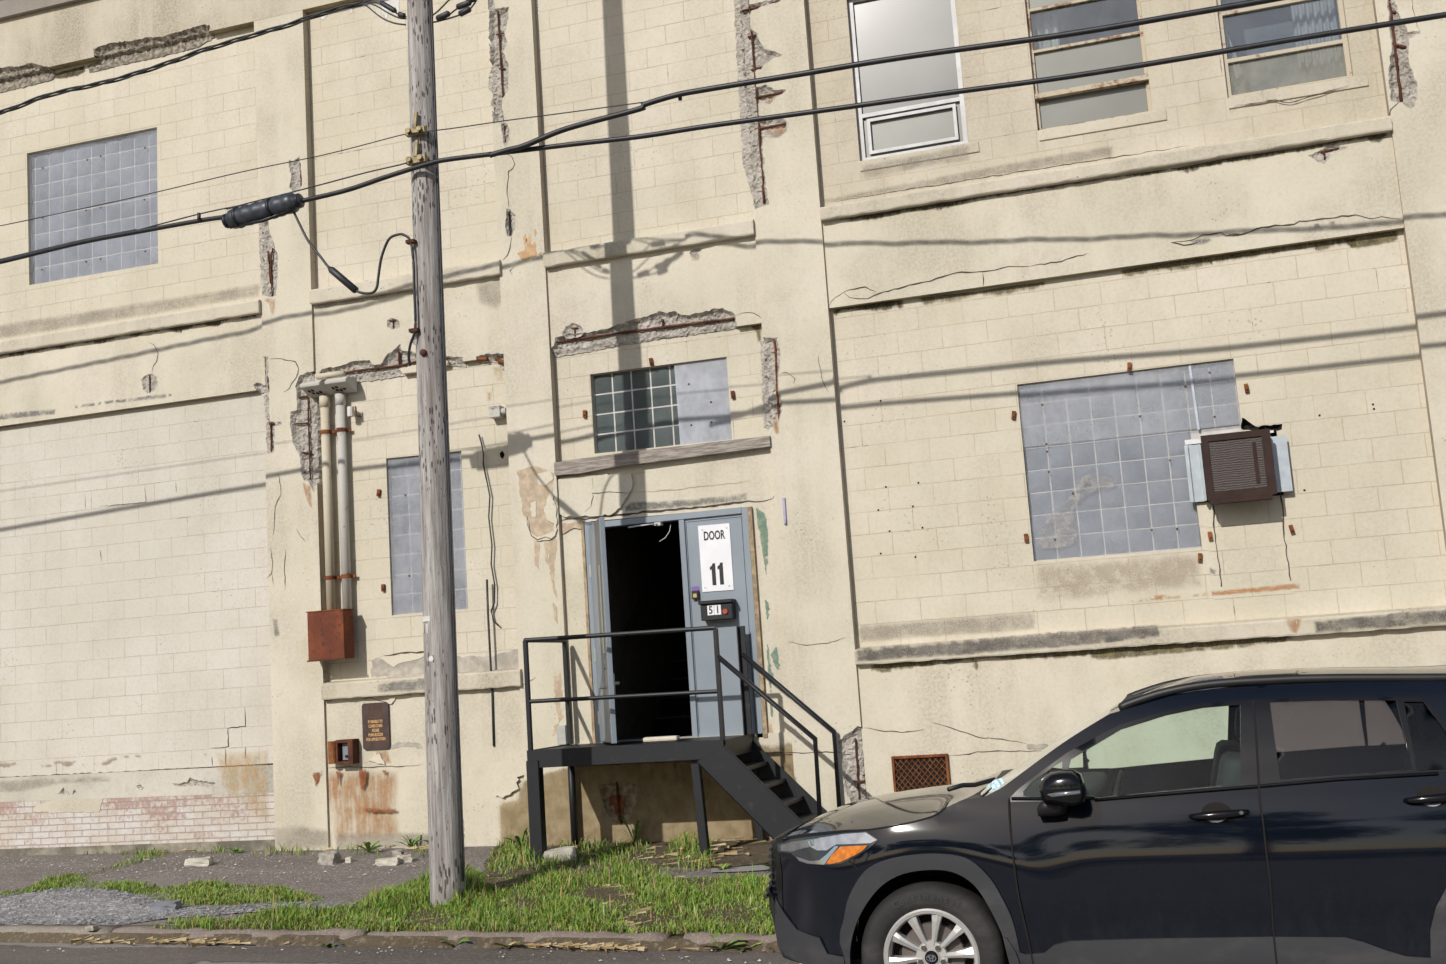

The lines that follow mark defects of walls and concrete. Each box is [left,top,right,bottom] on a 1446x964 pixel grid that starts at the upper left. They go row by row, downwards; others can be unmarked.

spalling [0,63,55,92]
spalling [87,24,215,73]
spalling [488,0,510,148]
spalling [734,0,789,209]
spalling [1387,0,1421,109]
crack [1171,214,1397,246]
crack [831,254,1085,302]
spalling [551,308,738,357]
spalling [254,318,417,492]
corrosion [313,757,396,832]
peeling [492,756,773,846]
spalling [838,726,867,802]